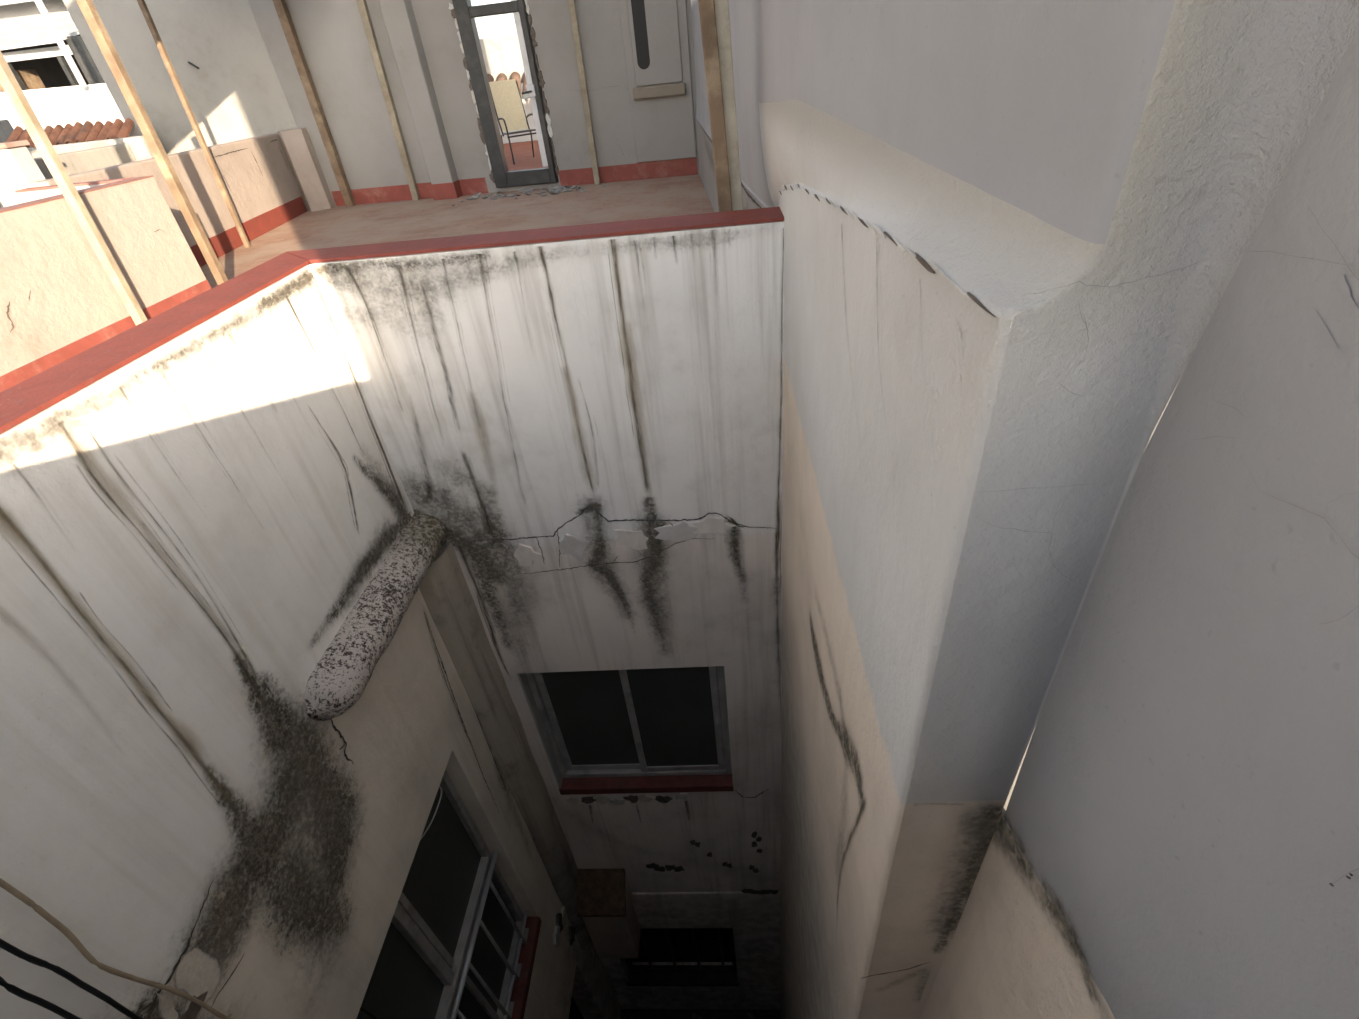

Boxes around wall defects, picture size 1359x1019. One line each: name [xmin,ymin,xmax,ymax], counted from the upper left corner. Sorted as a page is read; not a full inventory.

damp [60,426,127,517]
damp [311,273,523,673]
damp [609,239,664,633]
damp [0,508,94,626]
damp [579,503,631,613]
crack [464,507,776,575]
damp [728,520,740,577]
damp [118,593,355,968]
damp [934,806,1093,1000]
damp [135,991,182,1019]